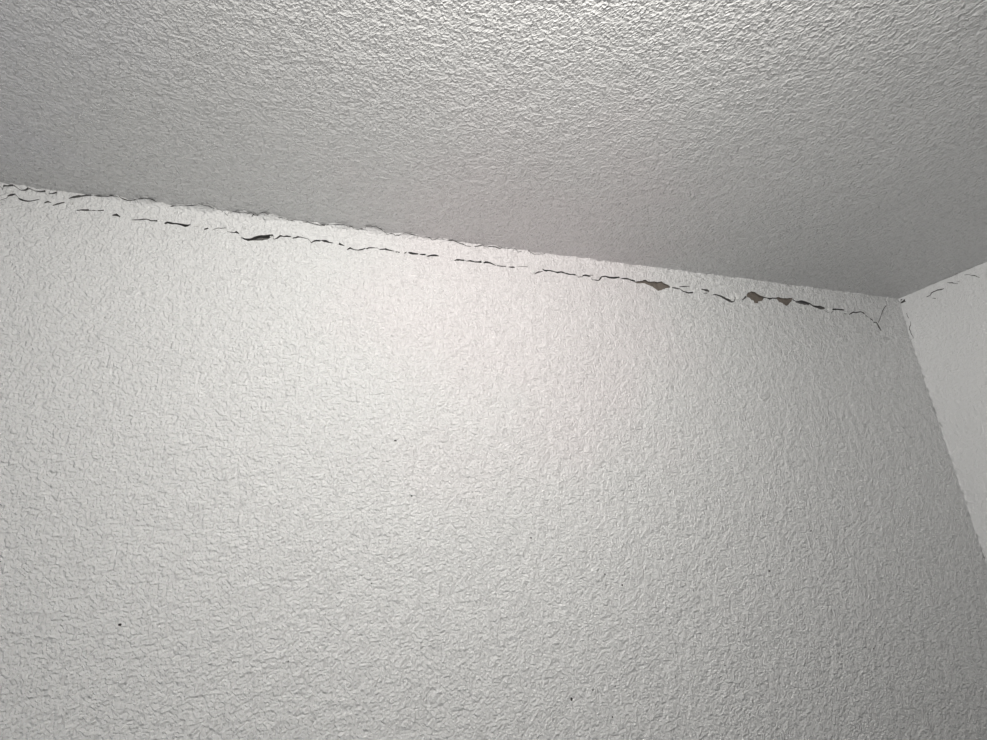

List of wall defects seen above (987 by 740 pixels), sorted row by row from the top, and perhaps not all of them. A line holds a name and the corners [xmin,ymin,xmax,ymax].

crack [2,184,635,282]
flaking render [635,280,669,291]
flaking render [747,291,764,303]
flaking render [776,297,811,306]
crack [668,274,980,336]